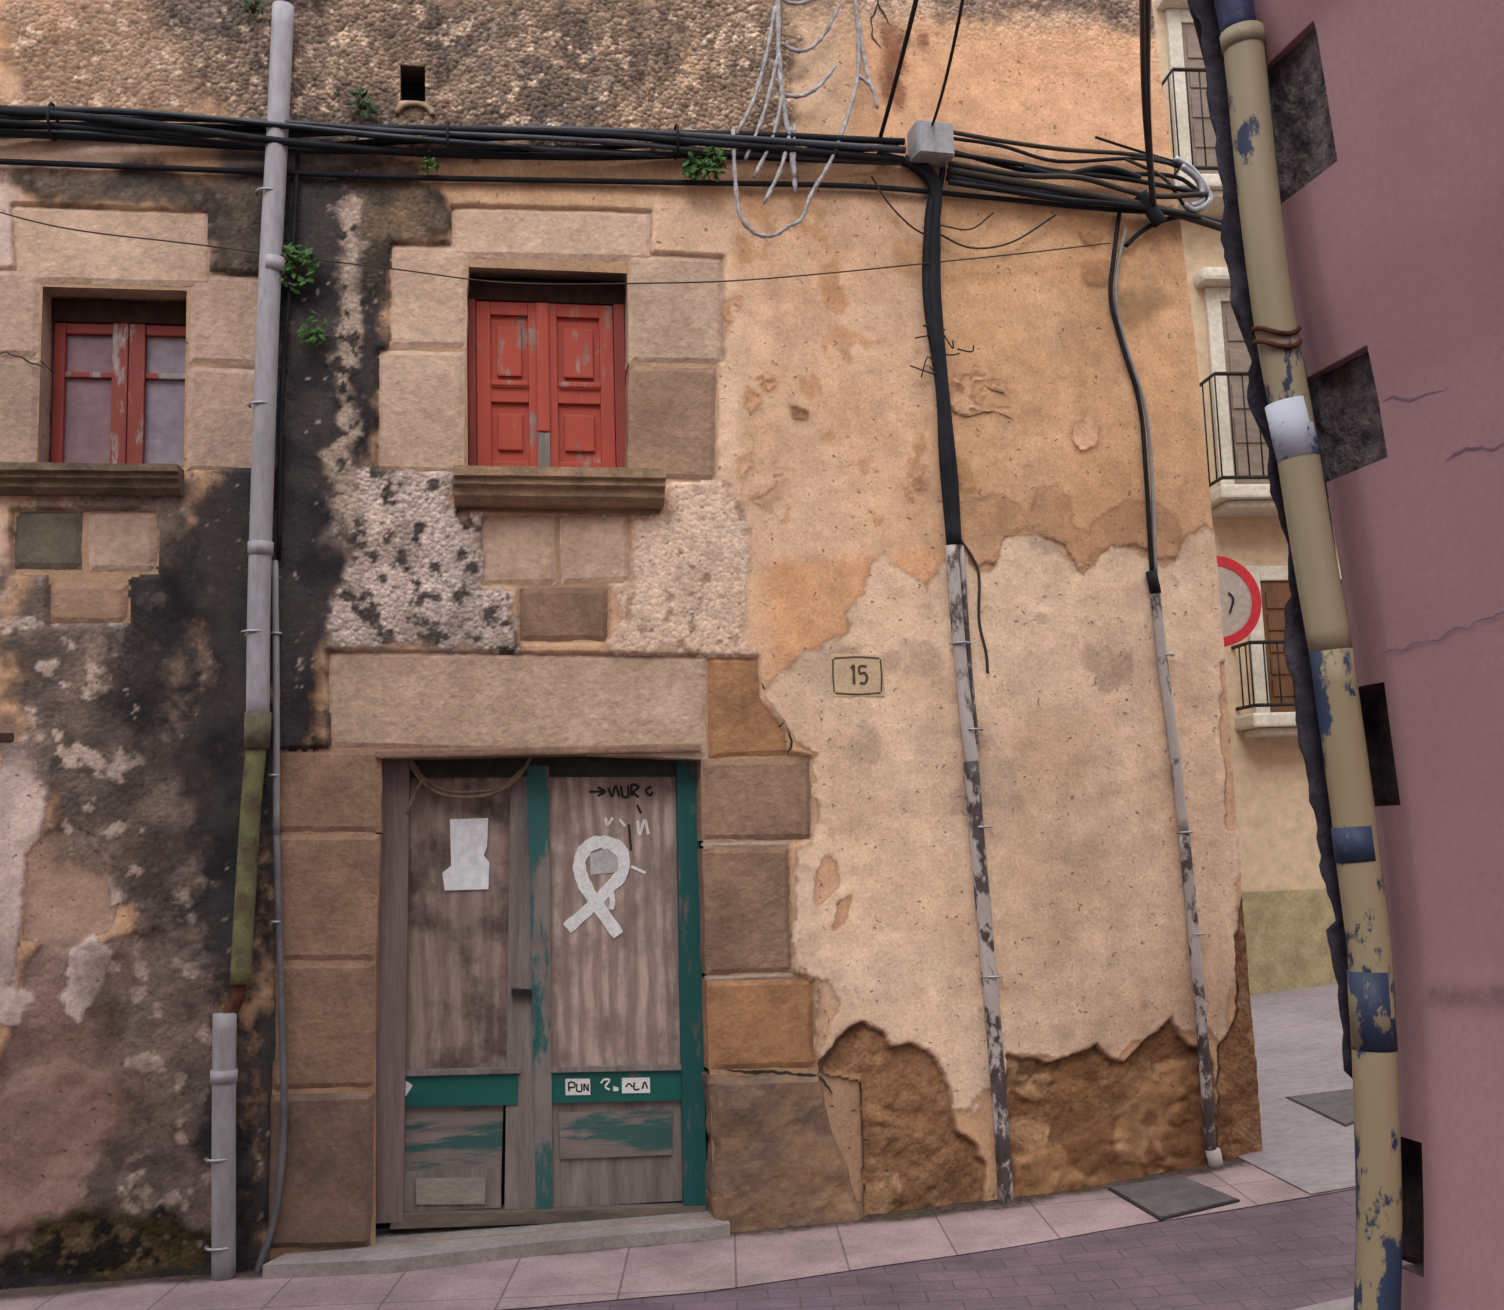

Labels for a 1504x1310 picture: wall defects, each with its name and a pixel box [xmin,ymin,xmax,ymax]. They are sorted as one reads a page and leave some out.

crack [0,351,45,369]
spalling [950,365,1010,414]
spalling [1072,413,1102,450]
leakage [0,0,689,1289]
peeling [763,459,1263,1216]
peeling [0,829,156,1111]
peeling [0,1230,36,1260]